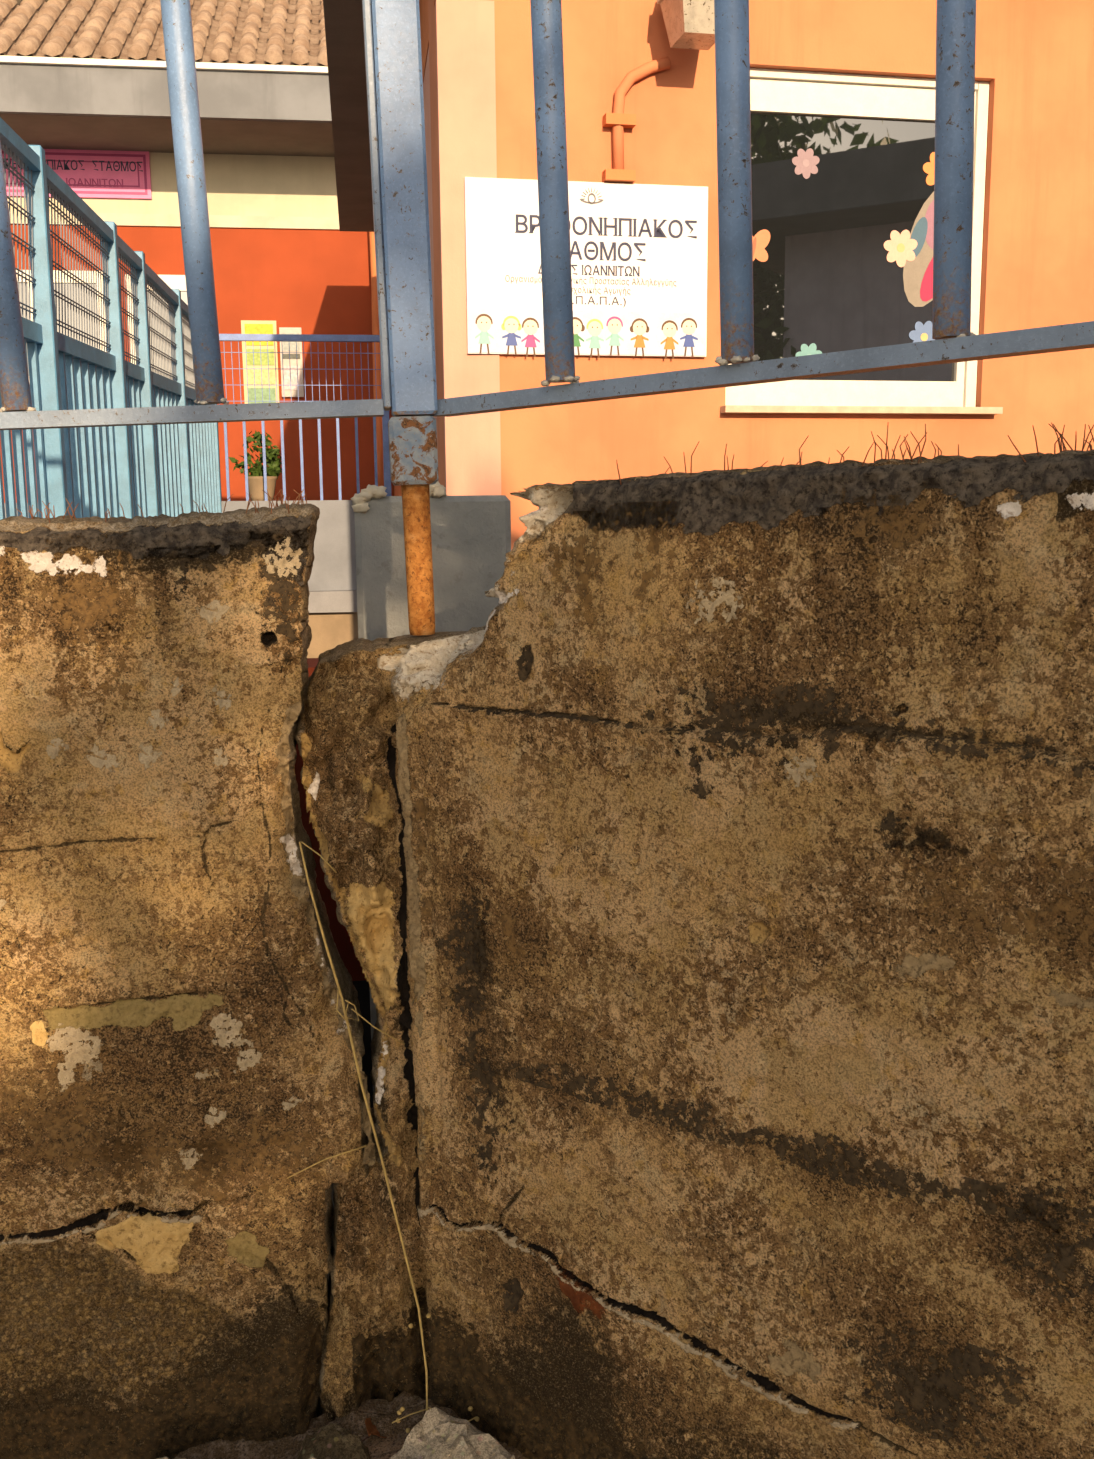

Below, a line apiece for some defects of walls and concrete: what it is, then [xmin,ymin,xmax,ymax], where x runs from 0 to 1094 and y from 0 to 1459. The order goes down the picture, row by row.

water stain [0,514,313,711]
spalling [377,487,573,703]
crack [431,702,652,732]
crack [386,723,918,1456]
crack [0,1195,249,1261]
water stain [0,1308,322,1459]
crack [265,1259,300,1317]
water stain [350,1268,648,1459]
water stain [823,1309,1042,1459]